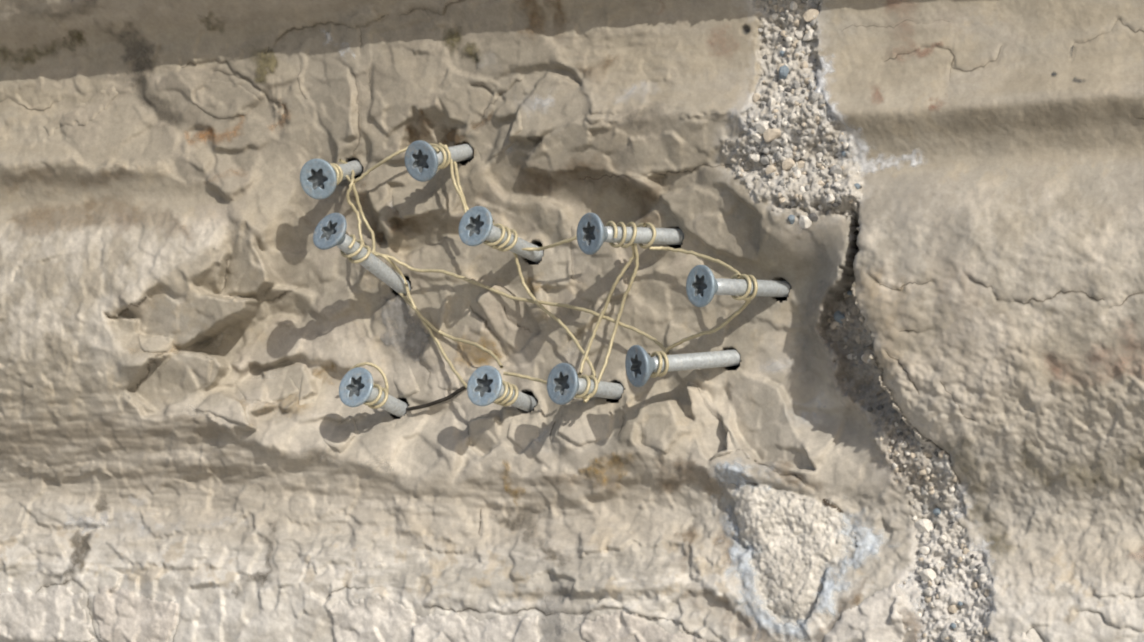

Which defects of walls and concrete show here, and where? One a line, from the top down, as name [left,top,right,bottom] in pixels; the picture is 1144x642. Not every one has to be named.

spalling [43,0,894,499]